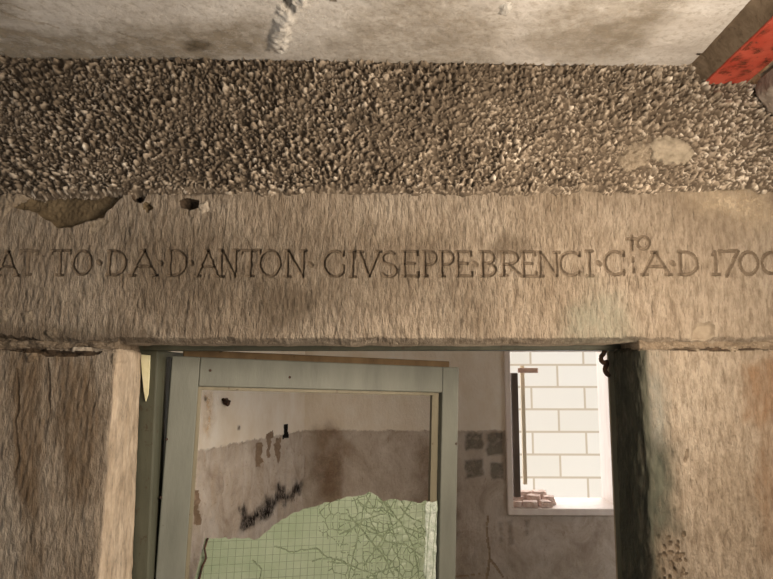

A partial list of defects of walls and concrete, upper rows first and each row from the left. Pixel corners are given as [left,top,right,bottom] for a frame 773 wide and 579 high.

spalling [14,196,123,234]
crack [0,333,102,475]
peeling [255,424,289,467]
peeling [194,490,202,525]
water stain [239,483,302,531]
crack [318,493,426,579]